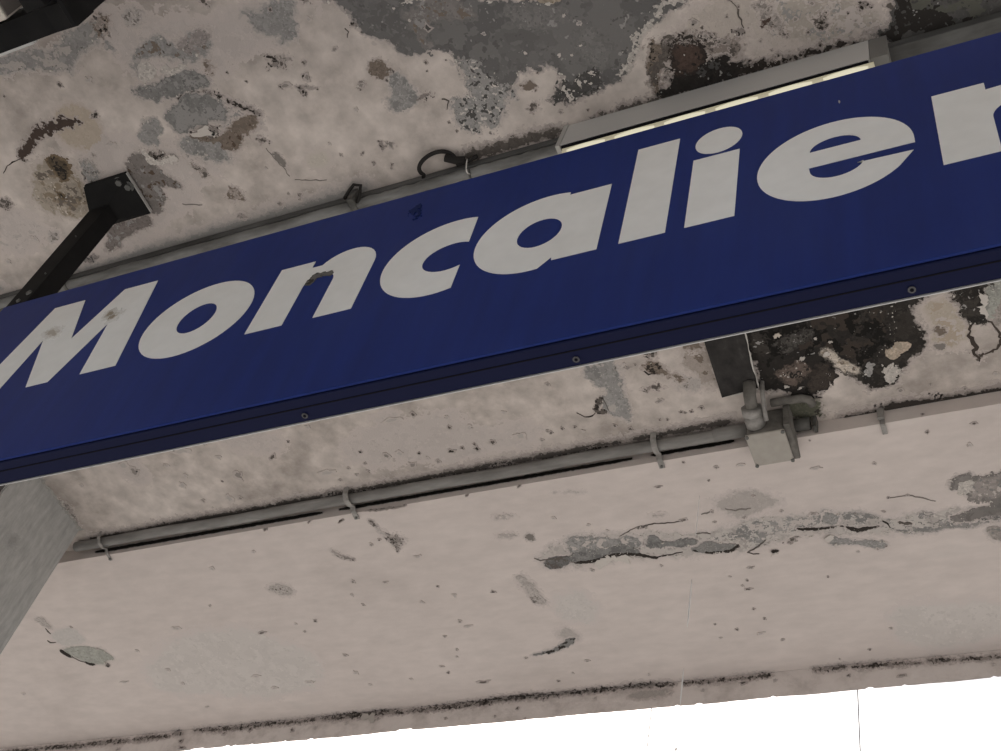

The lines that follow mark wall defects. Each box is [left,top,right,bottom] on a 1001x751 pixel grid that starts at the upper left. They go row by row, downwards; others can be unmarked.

peeling [297,0,752,138]
water stain [651,0,1001,99]
water stain [44,97,240,266]
peeling [101,28,264,255]
water stain [0,197,63,260]
peeling [864,341,912,384]
peeling [978,293,989,319]
crack [967,321,1001,362]
peeling [532,471,1001,573]
flaking render [62,644,116,668]
water stain [136,621,333,704]